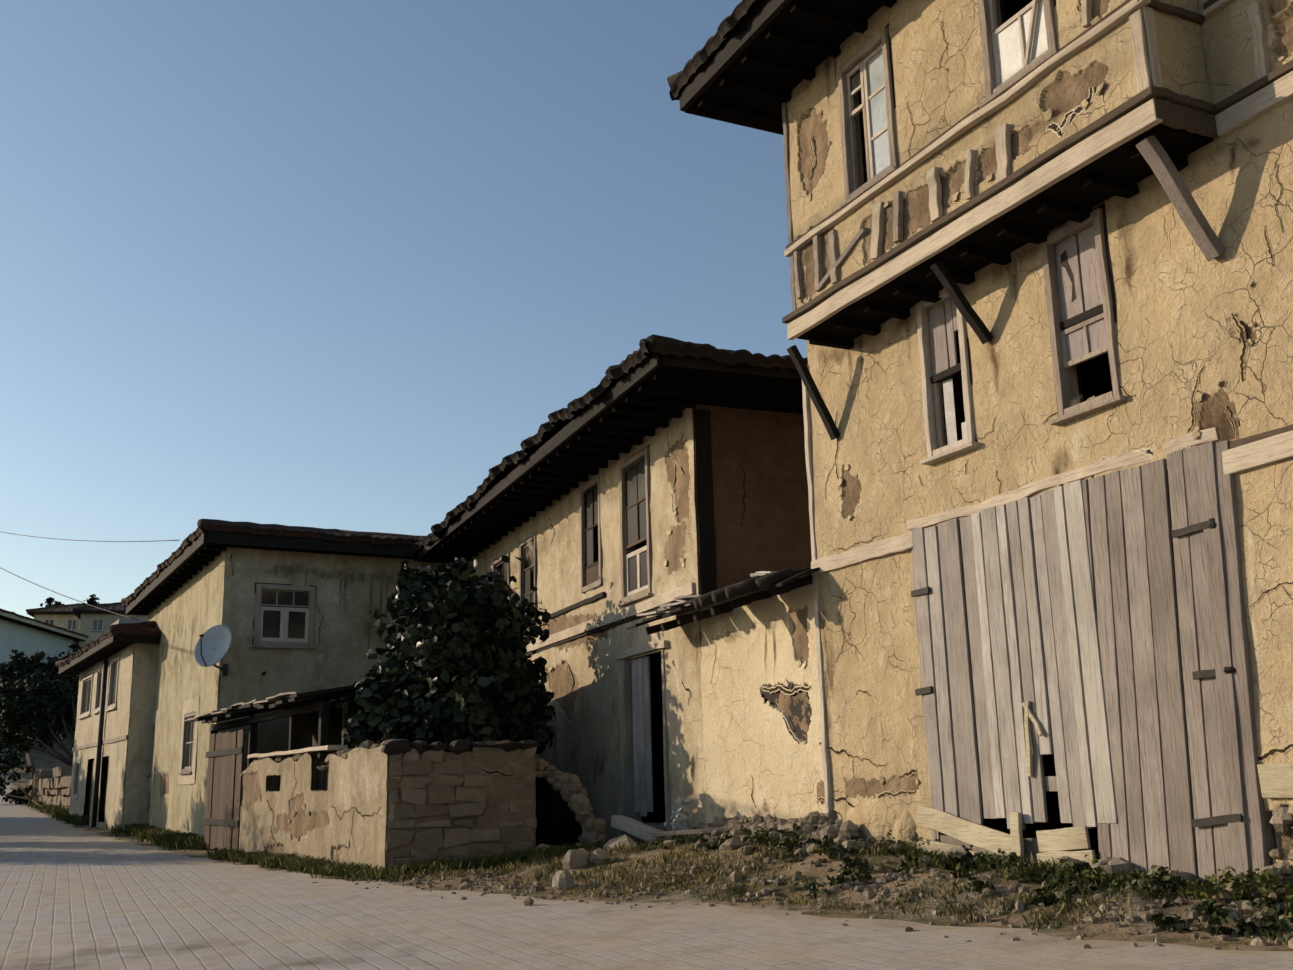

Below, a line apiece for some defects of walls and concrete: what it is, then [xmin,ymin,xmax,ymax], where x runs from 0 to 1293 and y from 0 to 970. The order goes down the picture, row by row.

flaking render [864,126,1032,263]
crack [1263,164,1293,266]
crack [1186,312,1248,448]
flaking render [1182,390,1239,450]
flaking render [663,433,690,575]
flaking render [836,464,862,521]
crack [1246,581,1293,609]
flaking render [786,605,809,669]
flaking render [758,679,811,743]
crack [1258,742,1293,762]